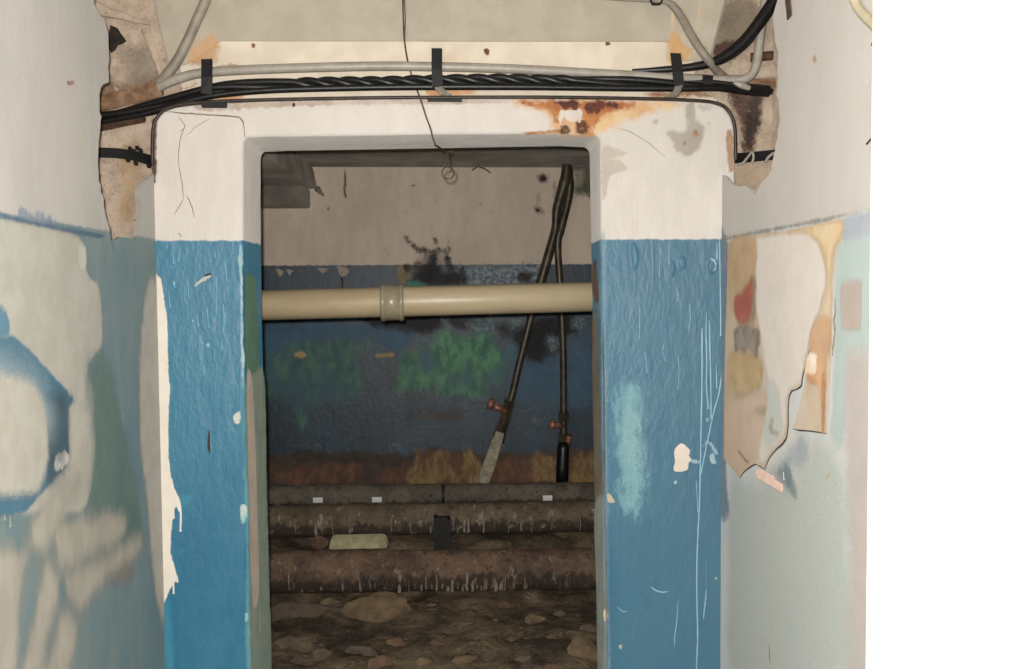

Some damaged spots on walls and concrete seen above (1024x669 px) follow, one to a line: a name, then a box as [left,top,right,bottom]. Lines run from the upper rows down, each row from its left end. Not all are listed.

spalling [96,0,198,111]
spalling [695,0,773,79]
spalling [98,114,157,240]
crack [166,111,245,236]
corrosion [507,91,710,138]
spalling [700,91,773,191]
flaking render [723,217,846,499]